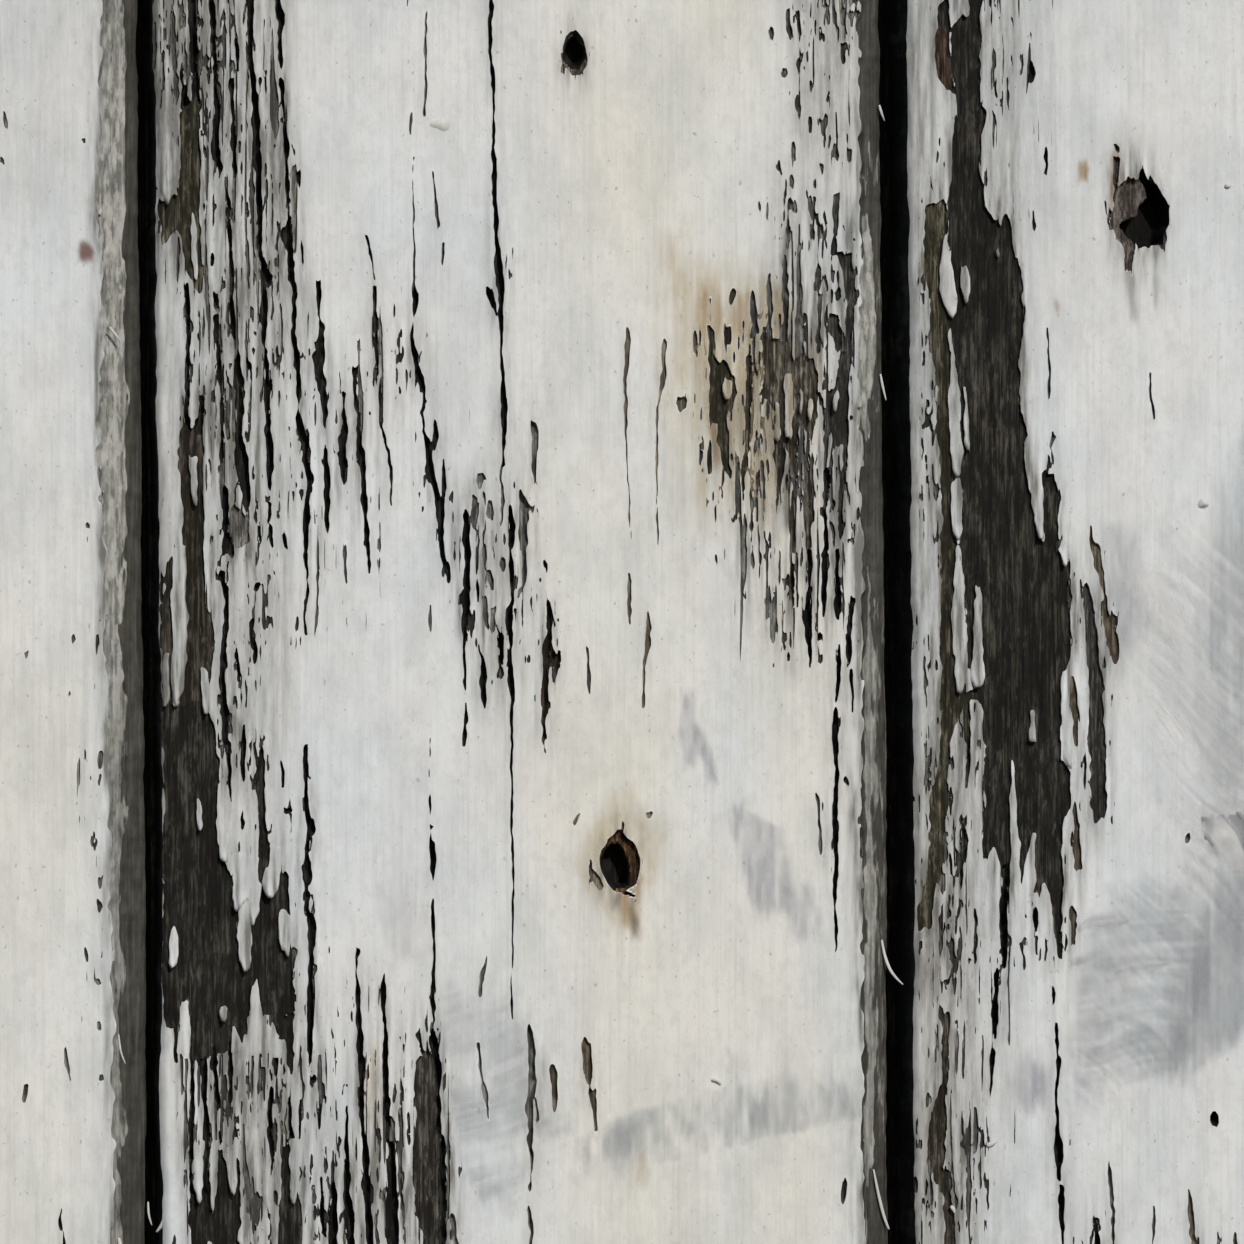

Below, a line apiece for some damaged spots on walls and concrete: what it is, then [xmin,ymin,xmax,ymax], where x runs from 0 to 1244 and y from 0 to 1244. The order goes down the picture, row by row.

peeling [152,0,462,1244]
crack [153,0,591,1244]
peeling [442,473,560,684]
peeling [685,0,860,667]
peeling [912,0,1119,1244]
peeling [549,1064,558,1112]
peeling [581,1037,597,1131]